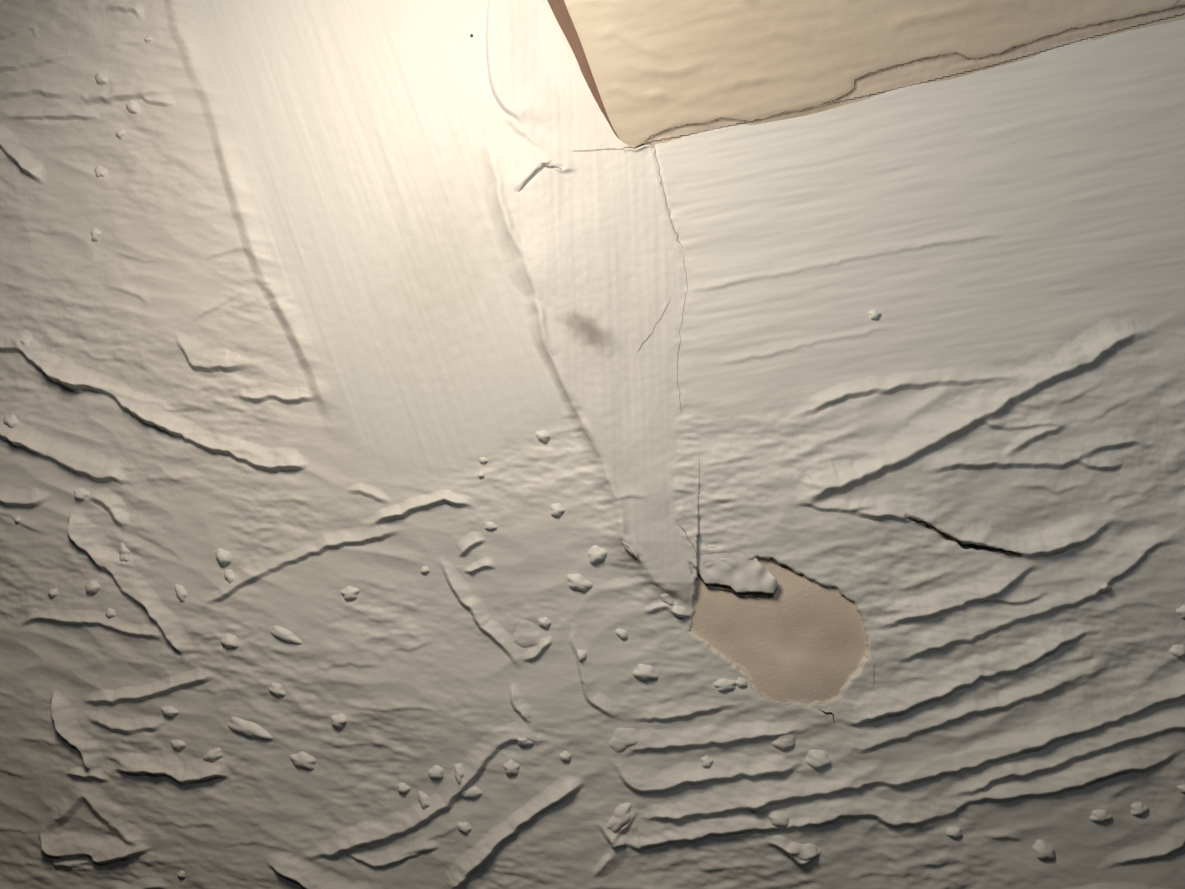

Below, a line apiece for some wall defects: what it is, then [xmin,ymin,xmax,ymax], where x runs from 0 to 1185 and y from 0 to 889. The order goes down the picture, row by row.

peeling [822,7,1185,105]
peeling [645,119,745,142]
crack [907,517,1020,555]
peeling [684,545,868,706]